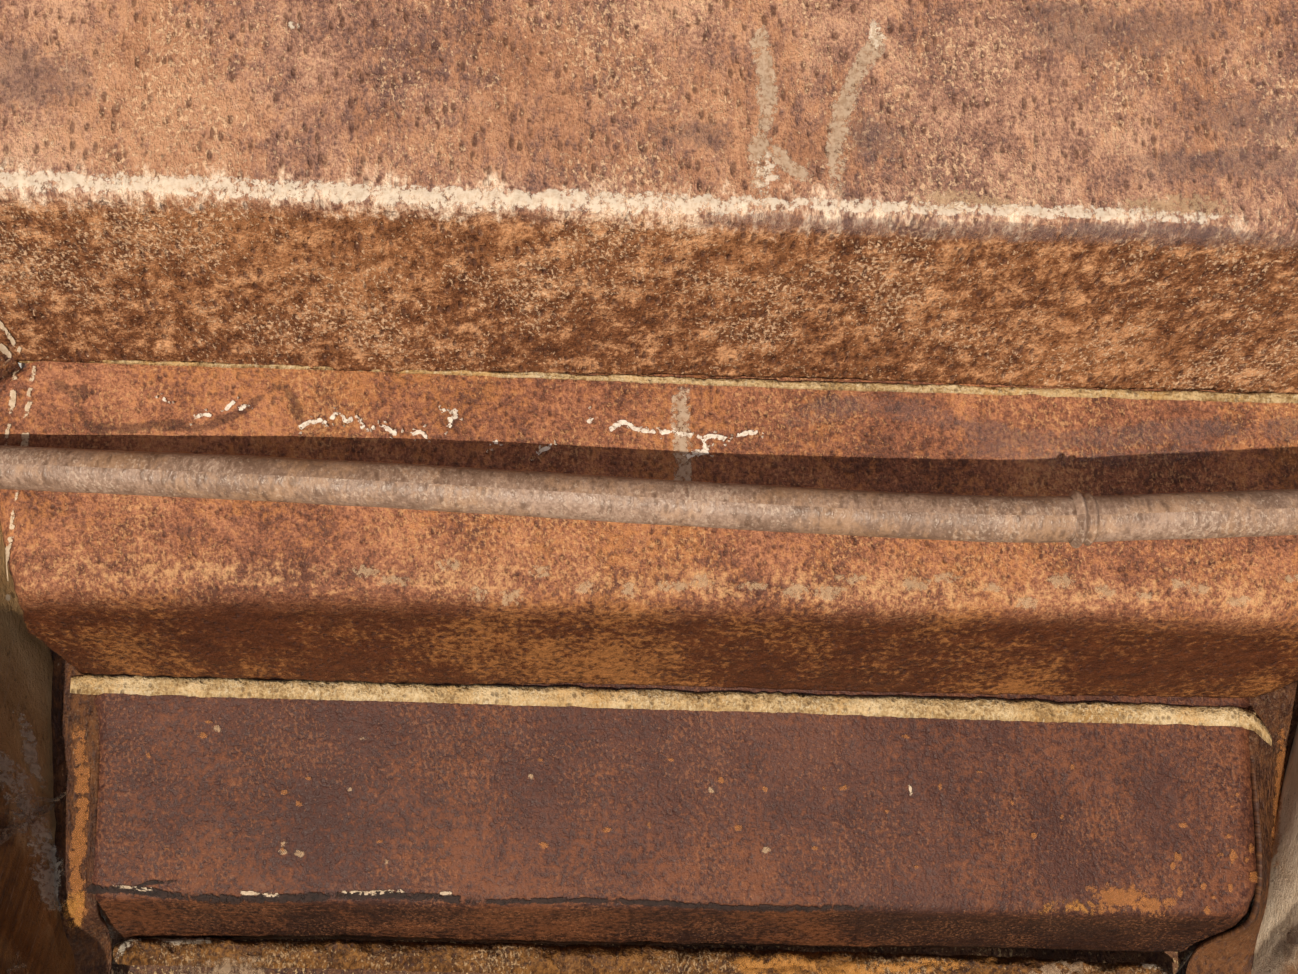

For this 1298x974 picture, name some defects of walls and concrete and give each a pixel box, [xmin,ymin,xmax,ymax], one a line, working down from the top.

rust [64,892,84,926]
rust [737,954,958,974]